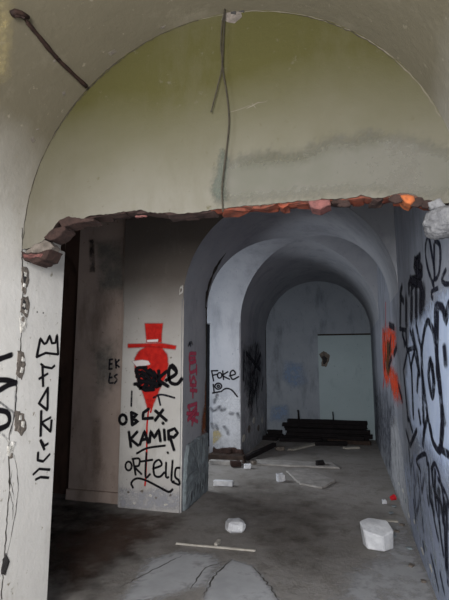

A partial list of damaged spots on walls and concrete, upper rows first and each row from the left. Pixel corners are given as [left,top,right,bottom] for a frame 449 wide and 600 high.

damp [212,133,449,202]
flaking render [19,193,432,333]
spalling [16,351,26,380]
spalling [319,351,330,367]
crack [190,559,232,597]